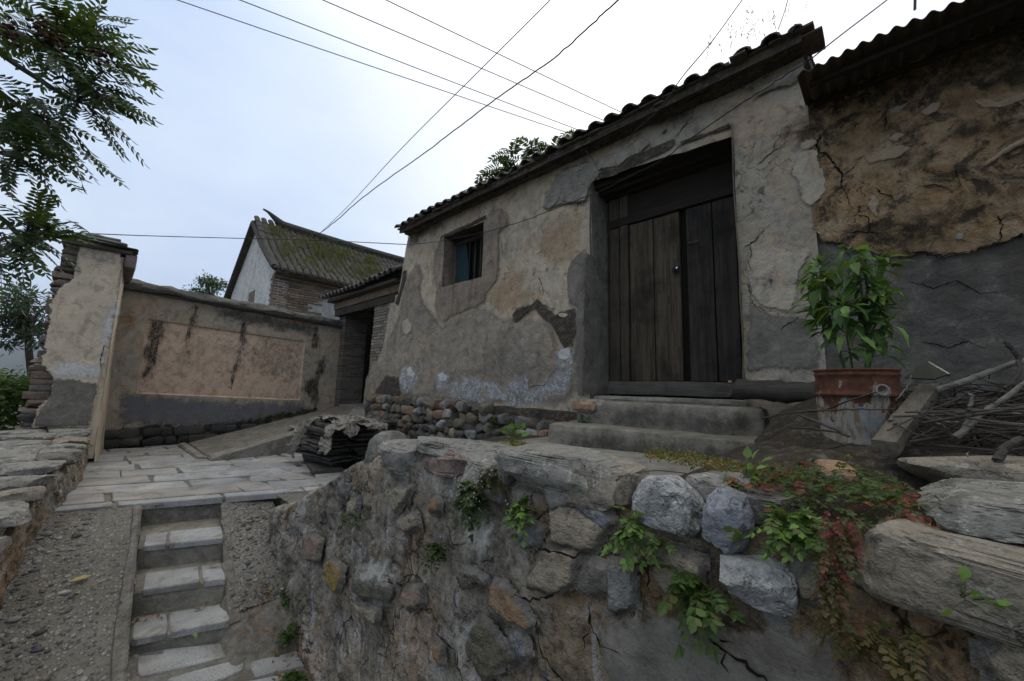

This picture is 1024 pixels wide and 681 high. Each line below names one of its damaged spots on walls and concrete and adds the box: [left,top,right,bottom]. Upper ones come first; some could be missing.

crack [816,129,884,242]
crack [907,216,1004,259]
water stain [119,311,325,427]
water stain [399,365,418,393]
spalling [369,251,619,402]
water stain [435,346,573,407]
crack [515,548,590,681]
crack [583,605,622,657]